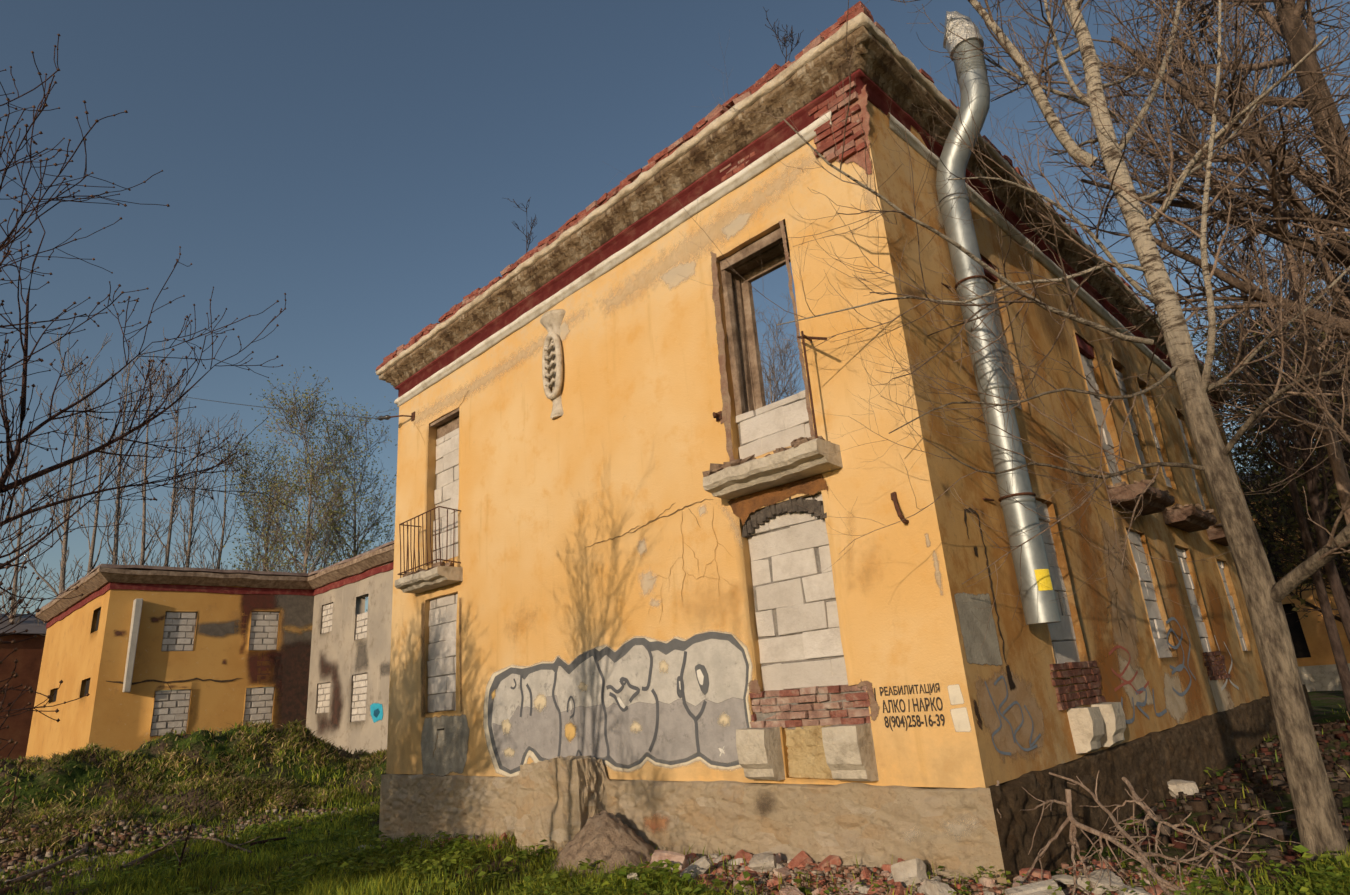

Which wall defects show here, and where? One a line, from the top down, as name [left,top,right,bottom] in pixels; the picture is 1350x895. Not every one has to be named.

spalling [808,81,873,209]
crack [583,499,740,622]
crack [107,678,242,699]